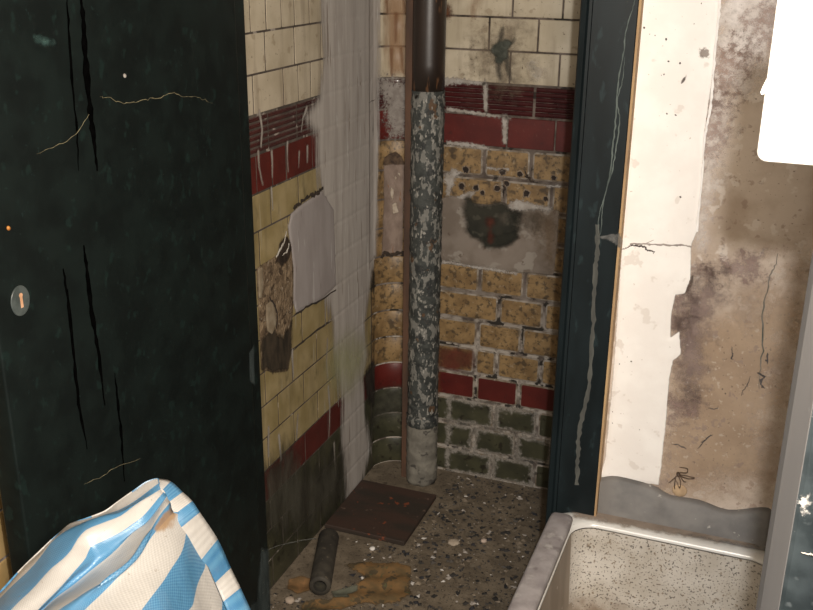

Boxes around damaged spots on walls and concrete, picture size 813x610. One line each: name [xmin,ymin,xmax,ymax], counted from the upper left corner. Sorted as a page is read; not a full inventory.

crack [66,0,98,171]
leakage [704,3,775,158]
crack [63,245,125,482]
spalling [257,231,336,373]
spalling [293,187,323,210]
leakage [265,0,405,528]
crack [575,0,635,485]
crack [625,240,692,253]
peeling [602,0,721,485]
leakage [665,249,799,485]
crack [757,254,778,389]